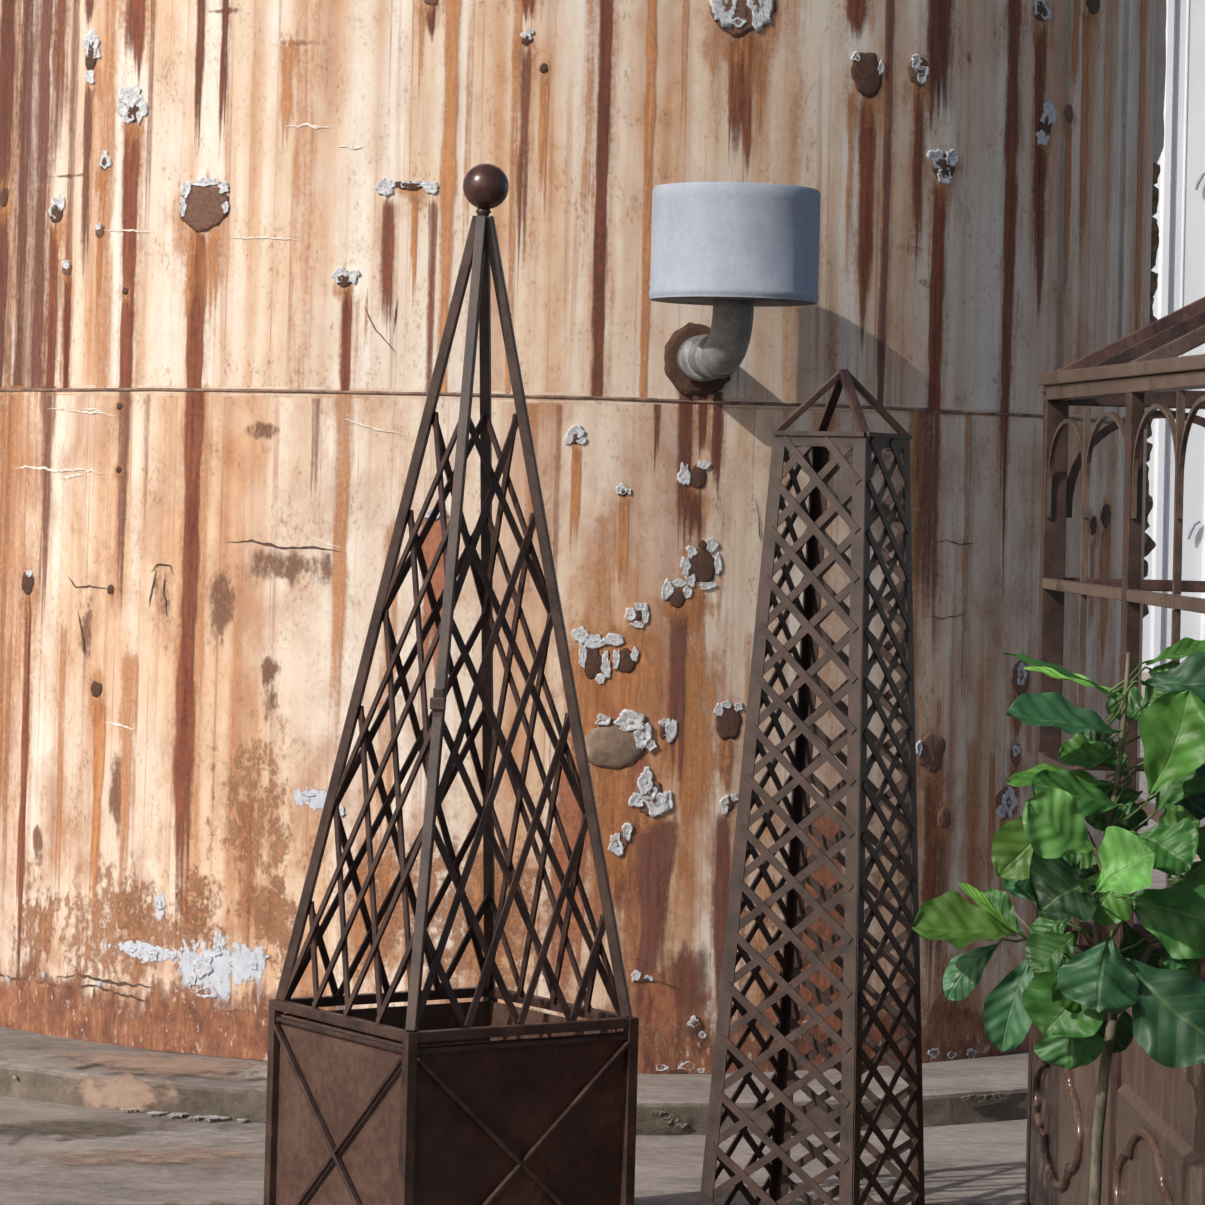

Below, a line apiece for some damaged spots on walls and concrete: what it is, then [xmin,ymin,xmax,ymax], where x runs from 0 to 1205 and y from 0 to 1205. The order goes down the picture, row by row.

peeling [709,0,779,167]
rust [846,0,895,406]
peeling [906,54,959,409]
rust [0,0,296,1112]
crack [227,539,339,552]
rust [348,517,657,990]
peeling [571,602,650,745]
peeling [658,578,693,777]
rust [663,391,749,819]
peeling [103,929,270,1010]
peeling [605,766,676,1013]
rust [635,946,781,1074]